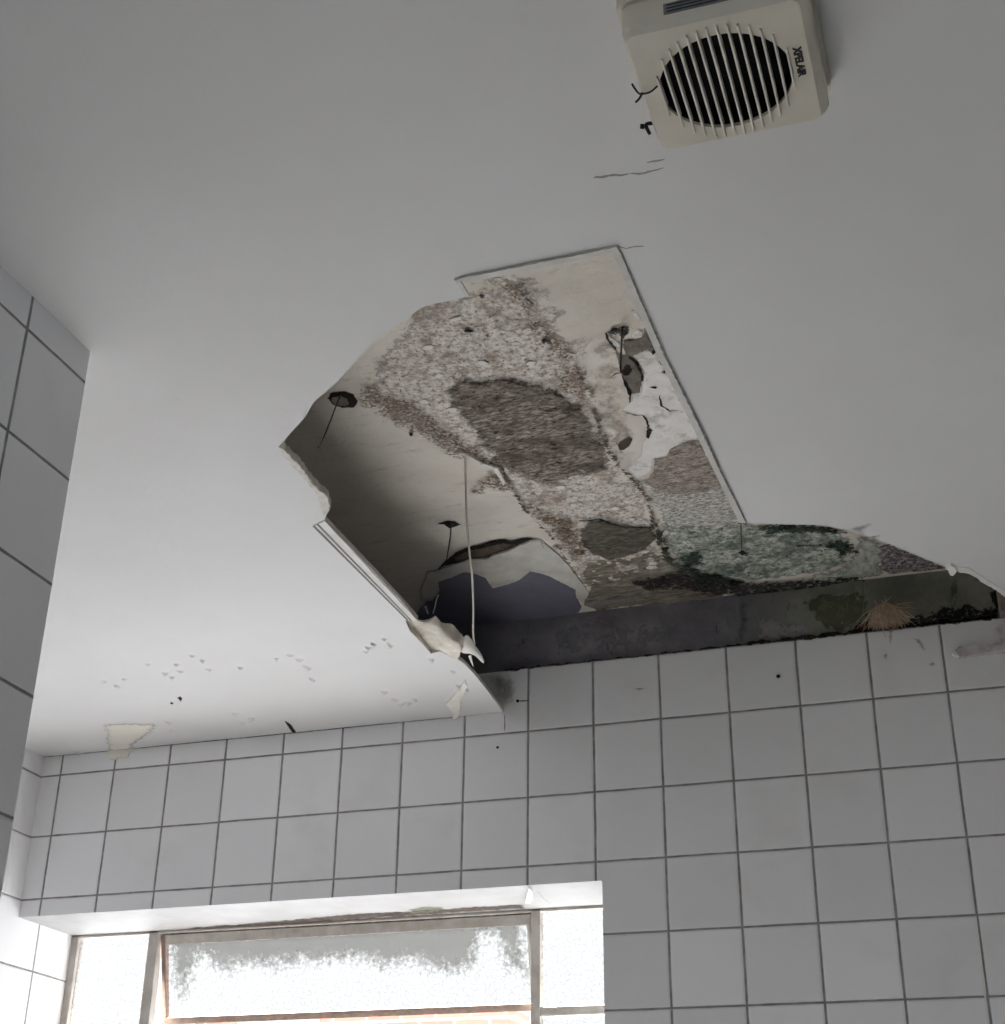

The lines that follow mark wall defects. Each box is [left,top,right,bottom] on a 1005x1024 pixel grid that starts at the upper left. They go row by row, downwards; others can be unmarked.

crack [593,159,664,178]
spalling [279,442,331,516]
peeling [368,278,721,666]
leakage [360,385,999,672]
spalling [946,563,1005,611]